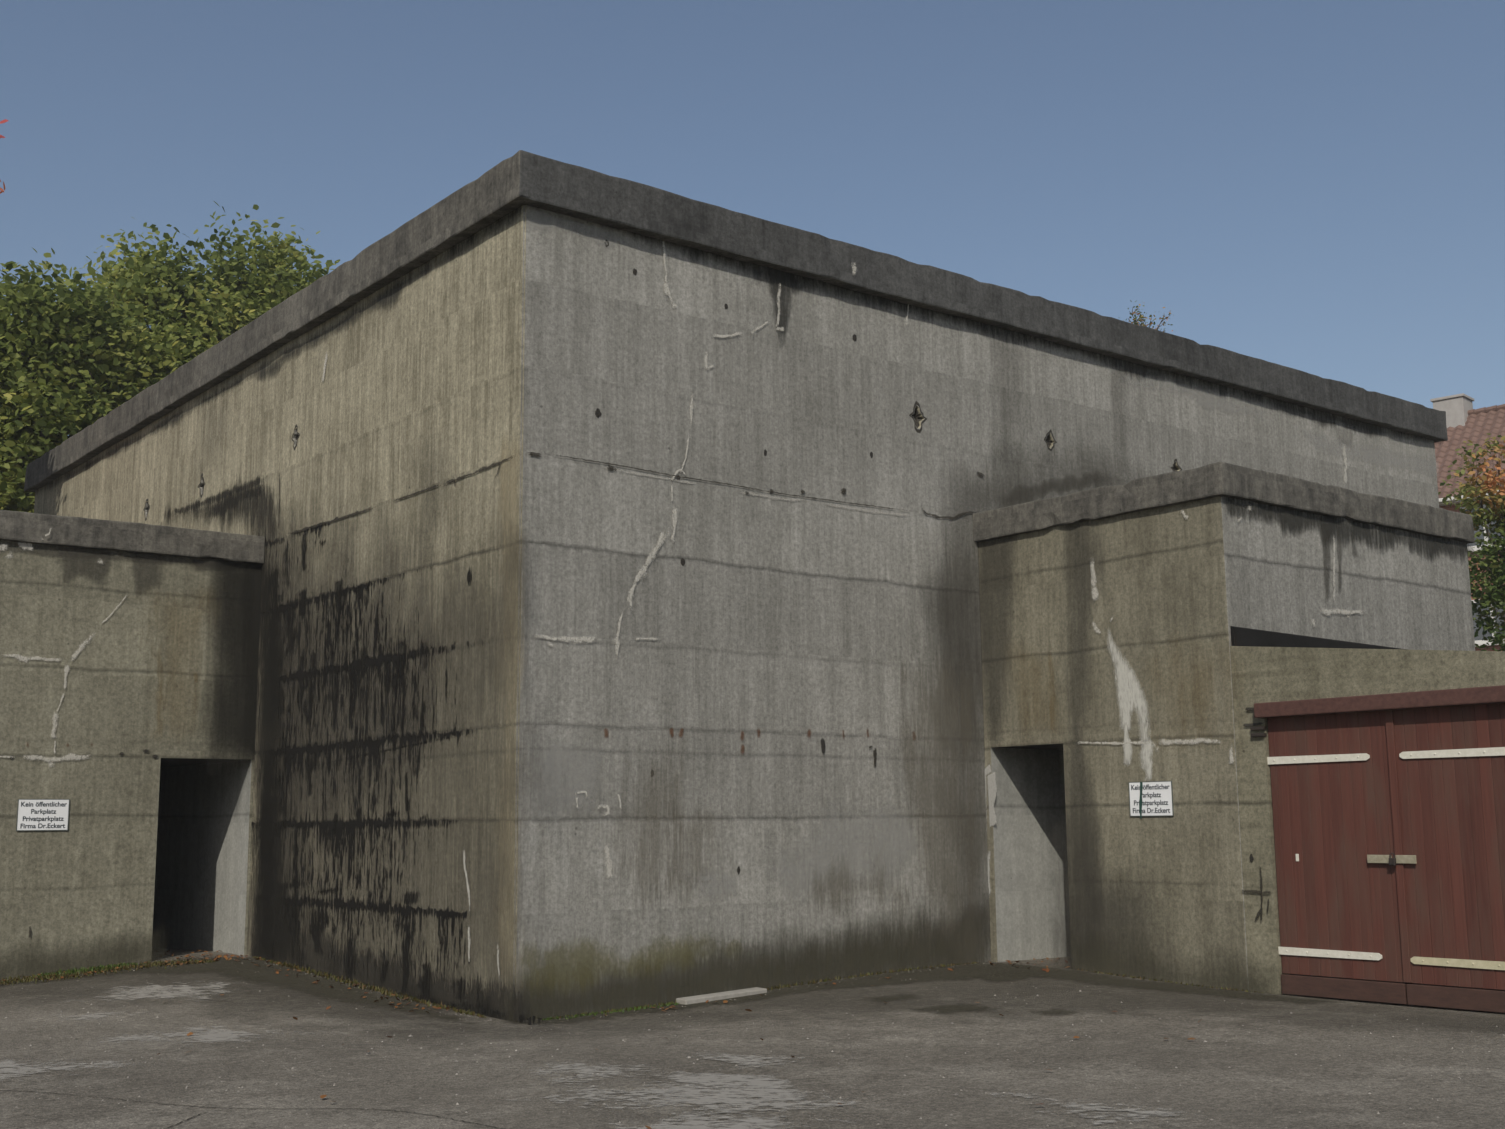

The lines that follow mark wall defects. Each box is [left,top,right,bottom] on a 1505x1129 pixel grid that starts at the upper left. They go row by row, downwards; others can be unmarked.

crack [662,242,677,308]
damp [175,477,264,516]
crack [278,285,976,655]
damp [1226,497,1470,627]
crack [4,597,126,754]
damp [0,521,1357,1031]
damp [0,1059,123,1079]
damp [106,1026,275,1045]
damp [536,1053,855,1129]
damp [1052,1099,1178,1124]